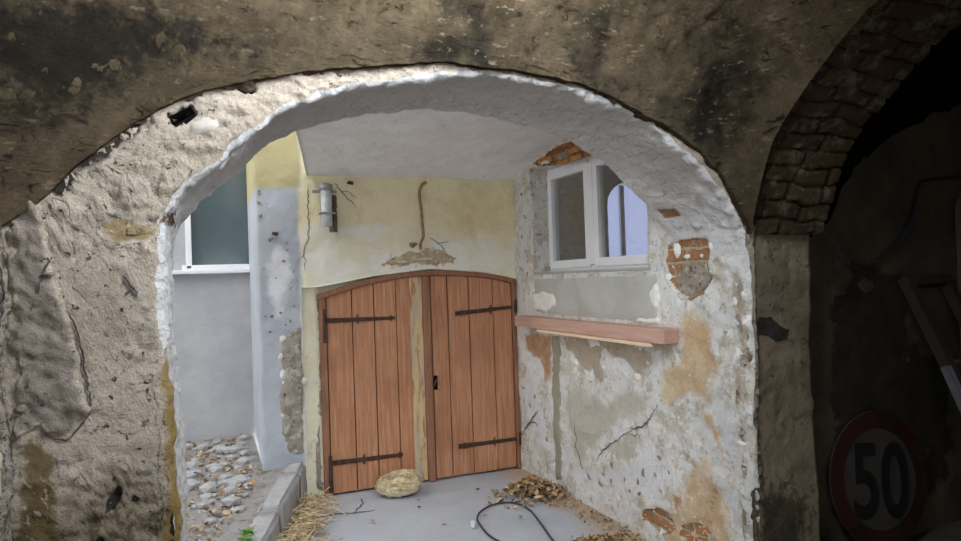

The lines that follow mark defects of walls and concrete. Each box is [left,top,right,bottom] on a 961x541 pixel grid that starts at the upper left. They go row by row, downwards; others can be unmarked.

flaking render [532,141,591,166]
leakage [9,427,79,541]
peeling [5,200,93,442]
flaking render [261,237,323,491]
flaking render [382,242,456,269]
crack [574,405,658,466]
peeling [567,436,711,541]
leakage [562,299,744,541]
flaking render [664,238,713,301]
flaking render [727,263,789,528]